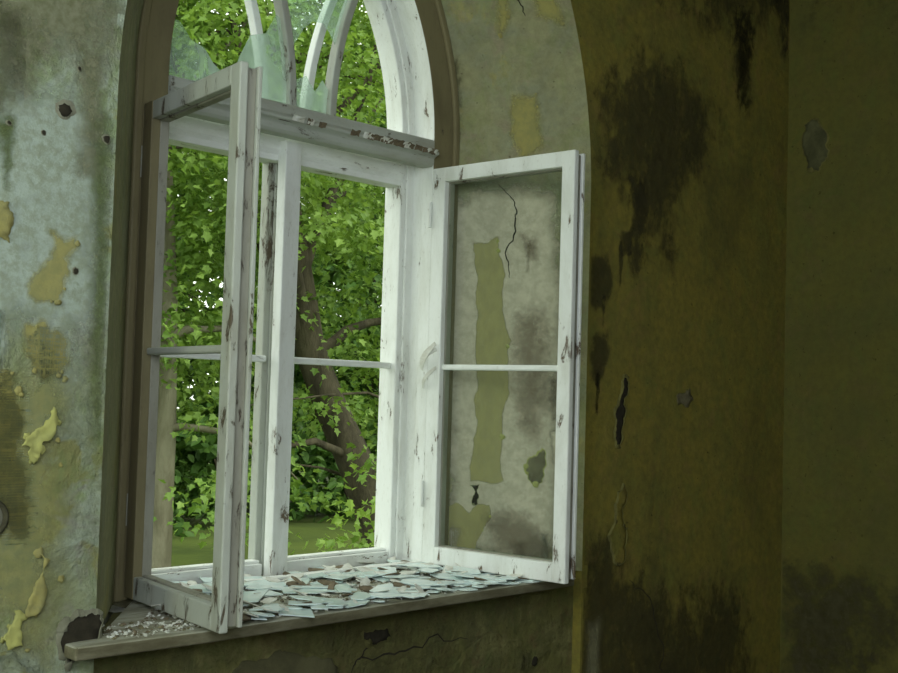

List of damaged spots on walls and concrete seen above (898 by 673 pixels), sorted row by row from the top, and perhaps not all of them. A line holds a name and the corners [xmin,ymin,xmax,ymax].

water stain [706,0,789,106]
water stain [591,54,707,315]
flaking render [0,47,111,653]
crack [351,633,466,673]
water stain [582,537,746,673]